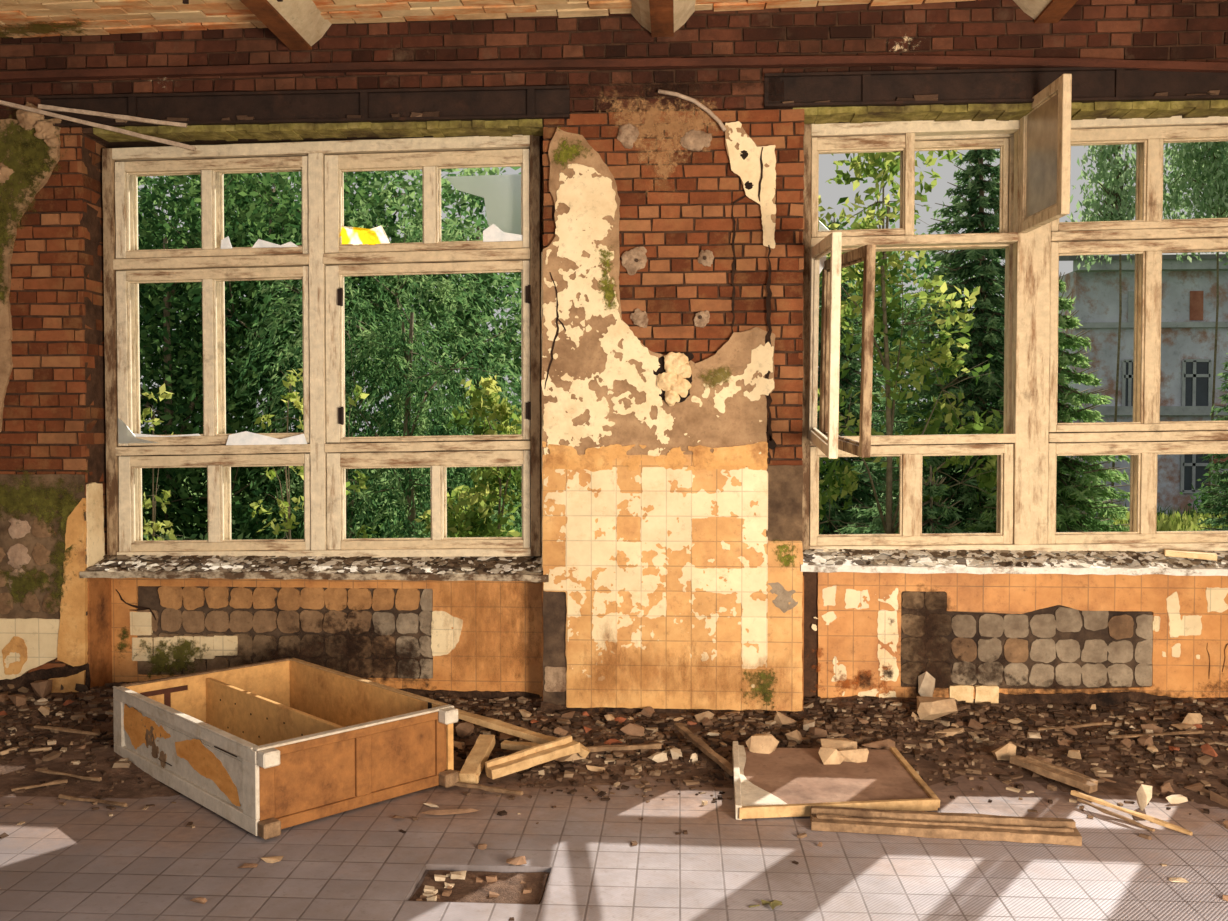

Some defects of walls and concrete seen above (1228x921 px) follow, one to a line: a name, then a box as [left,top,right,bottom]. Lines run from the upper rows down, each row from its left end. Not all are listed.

flaking render [0,161,88,470]
flaking render [130,109,804,714]
peeling [0,517,60,615]
flaking render [0,636,91,693]
peeling [811,585,1228,706]